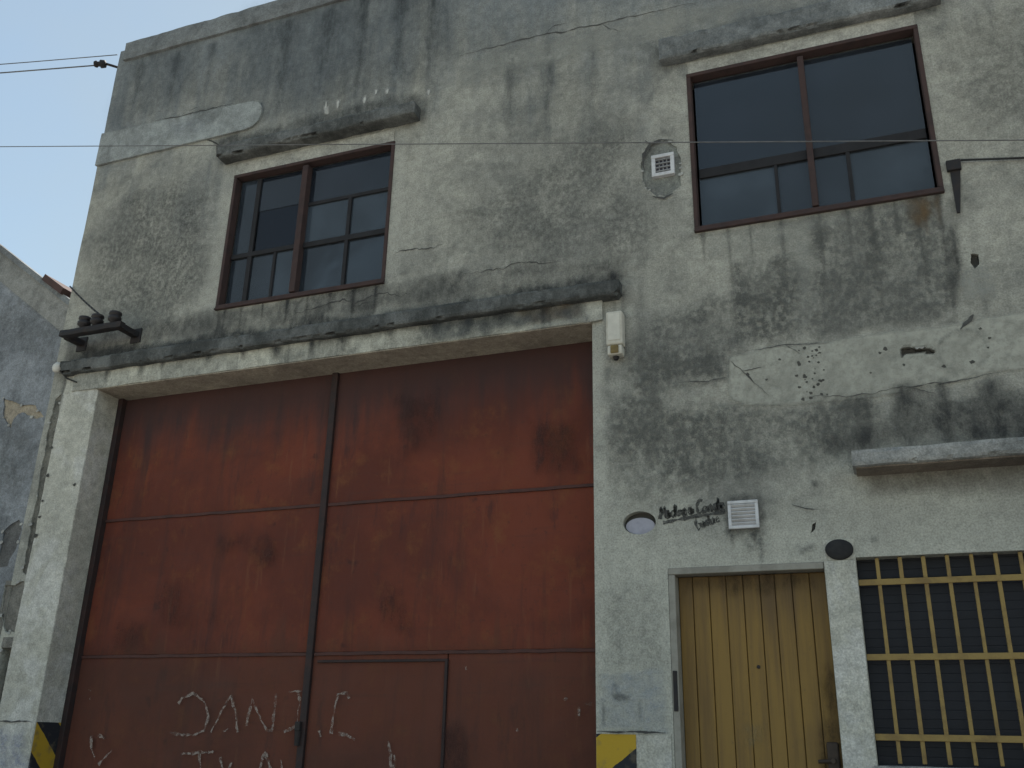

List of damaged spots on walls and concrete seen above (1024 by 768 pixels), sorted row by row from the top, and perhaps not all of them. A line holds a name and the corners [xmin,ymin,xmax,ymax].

crack [460,3,693,56]
spalling [641,138,684,196]
crack [474,261,554,273]
leakage [738,196,955,338]
crack [684,343,813,394]
spalling [729,312,1024,405]
crack [813,372,999,397]
spalling [0,396,61,635]